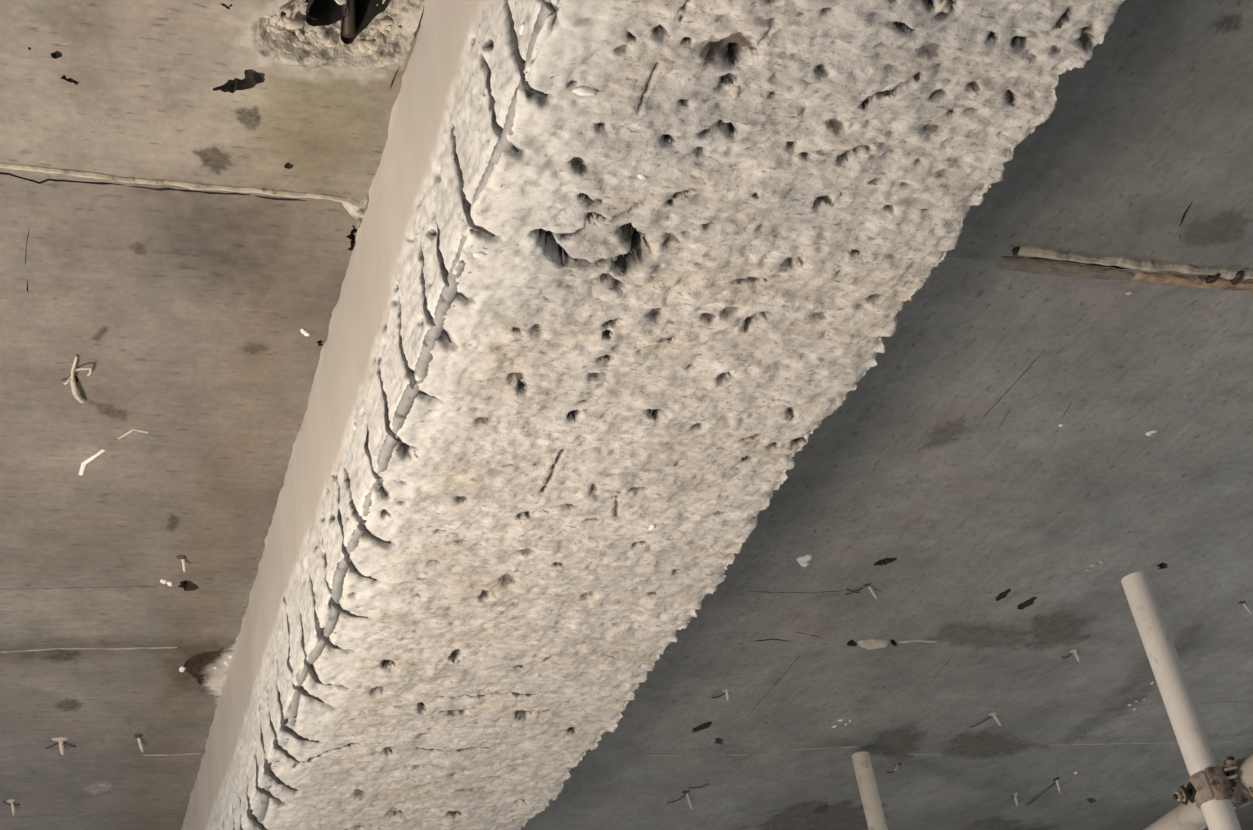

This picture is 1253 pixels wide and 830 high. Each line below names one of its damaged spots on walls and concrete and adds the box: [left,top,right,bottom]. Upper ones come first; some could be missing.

peeling [569,81,597,96]
spalling [830,119,842,134]
spalling [571,157,587,173]
spalling [539,193,648,289]
spalling [212,0,557,830]
peeling [797,554,812,567]
spalling [179,644,236,704]
spalling [692,721,724,745]